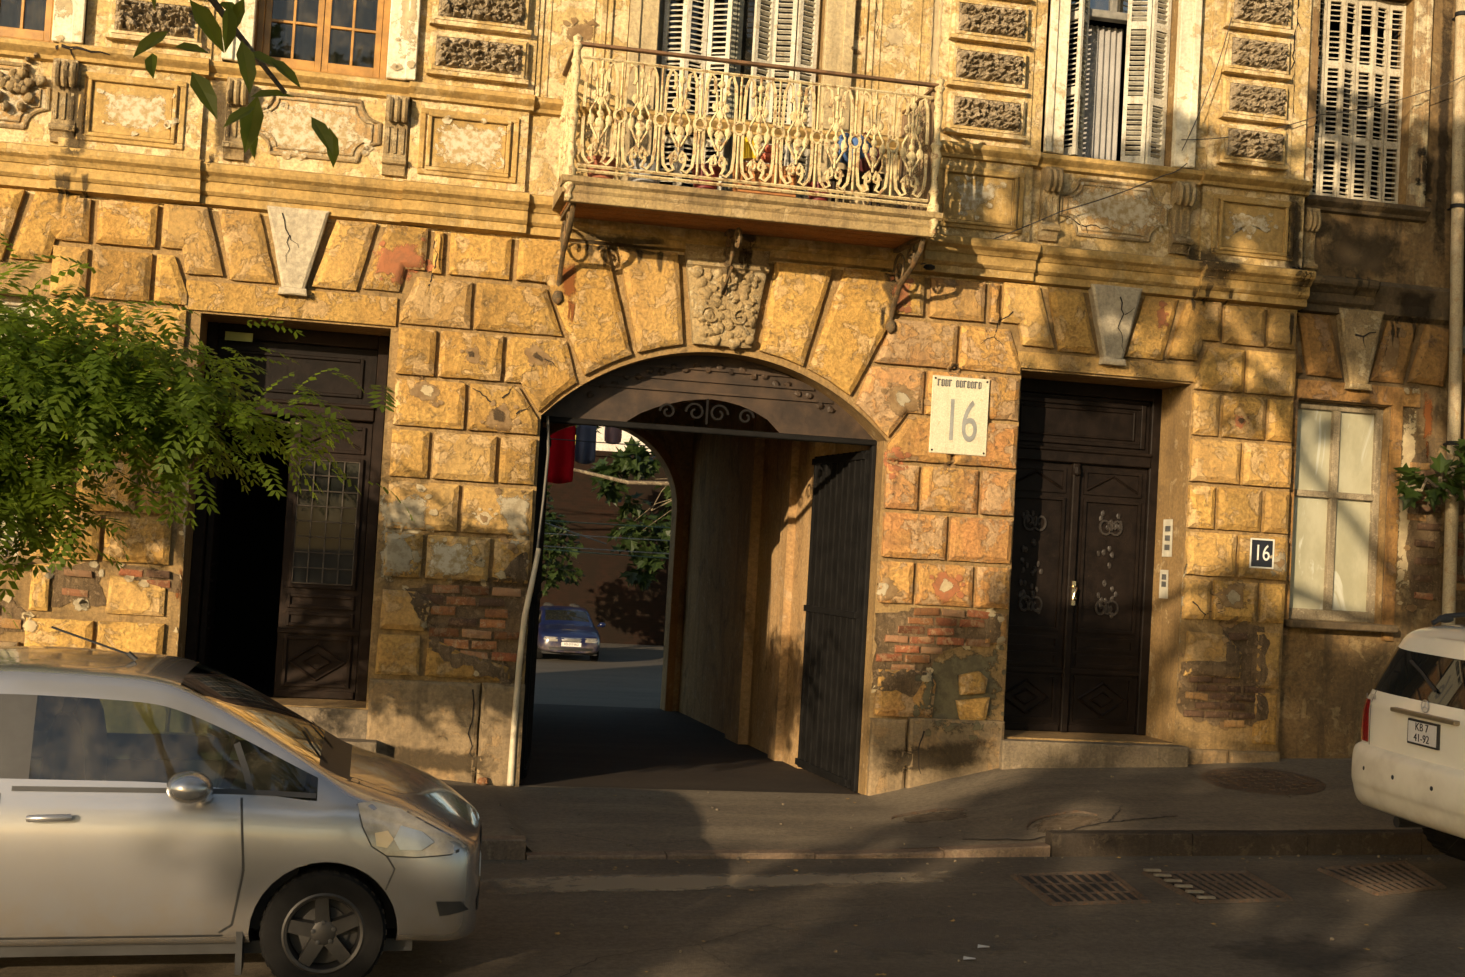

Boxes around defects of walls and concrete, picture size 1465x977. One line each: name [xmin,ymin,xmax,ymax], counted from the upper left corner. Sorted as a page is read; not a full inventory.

crack [282,213,299,255]
peeling [373,237,435,285]
crack [1118,297,1135,350]
flaking render [0,475,189,644]
flaking render [377,484,530,686]
flaking render [871,571,1006,736]
flaking render [1176,564,1270,731]